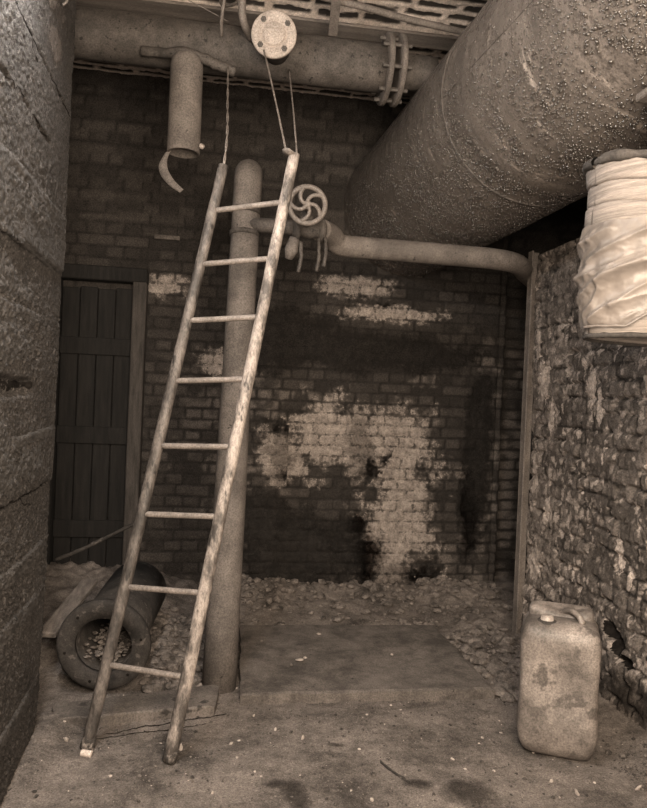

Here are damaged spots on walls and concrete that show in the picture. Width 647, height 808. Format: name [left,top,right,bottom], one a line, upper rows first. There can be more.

crack [15,0,70,116]
water stain [456,375,494,543]
water stain [242,490,366,584]
spalling [603,620,634,670]